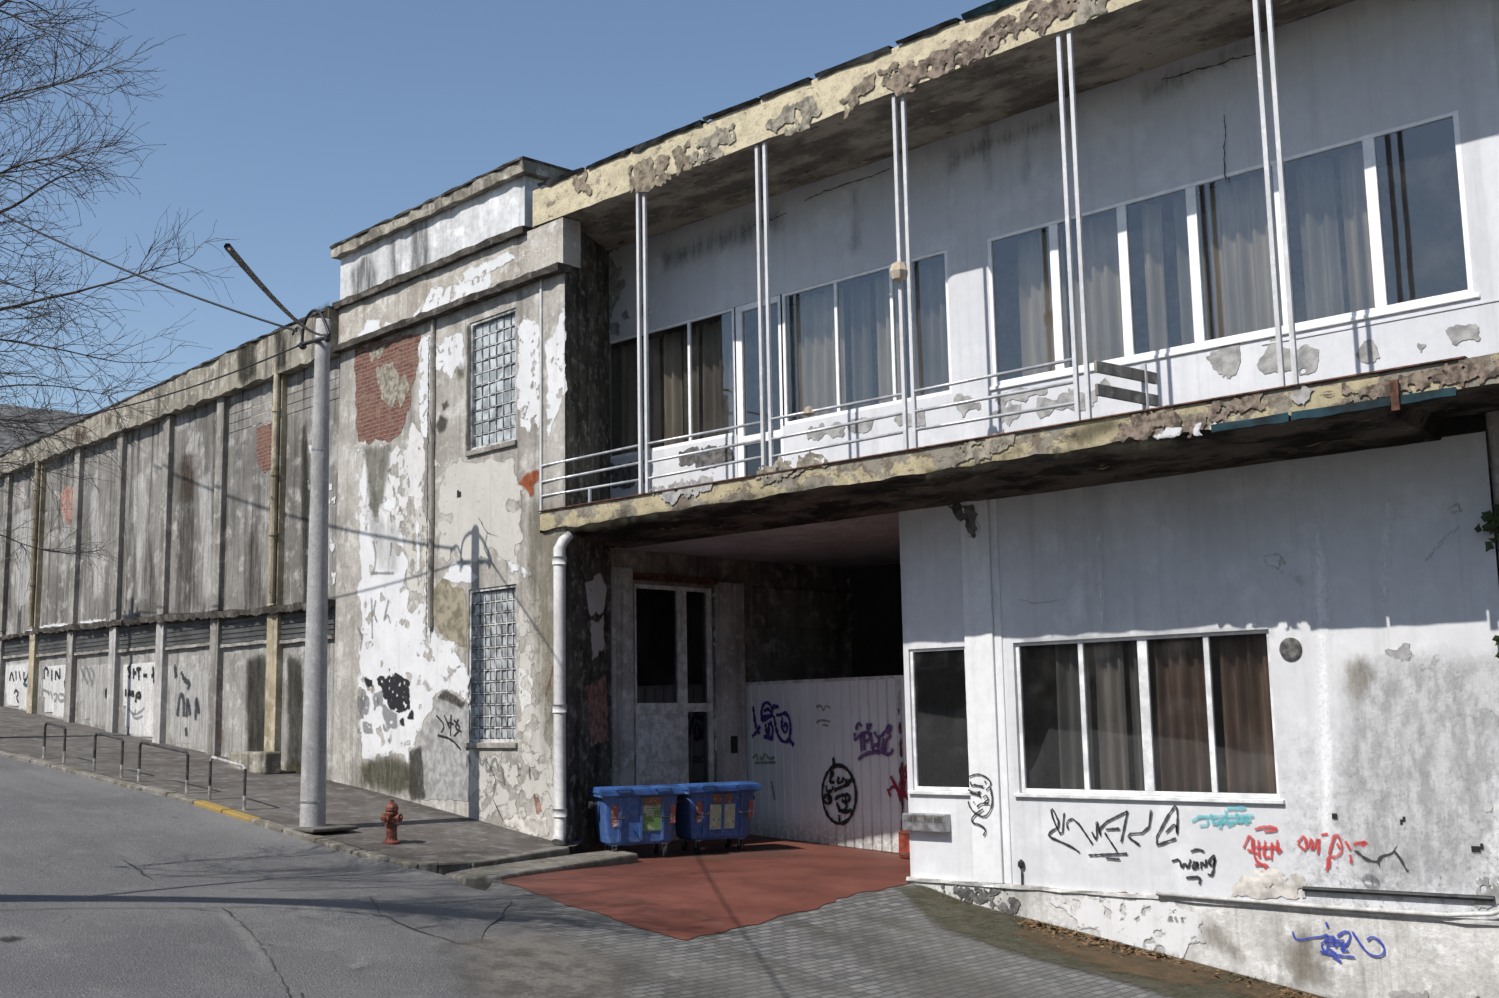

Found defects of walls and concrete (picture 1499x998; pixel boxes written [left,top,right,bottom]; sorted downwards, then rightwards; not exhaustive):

spalling [839,0,1107,120]
spalling [627,123,735,193]
spalling [1117,338,1319,442]
spalling [1341,324,1499,403]
damp [7,509,31,608]
damp [134,474,154,612]
damp [178,468,211,606]
peeling [354,251,554,838]
damp [246,655,265,751]
damp [286,656,303,773]
damp [1315,519,1499,881]
peeling [1049,895,1211,958]